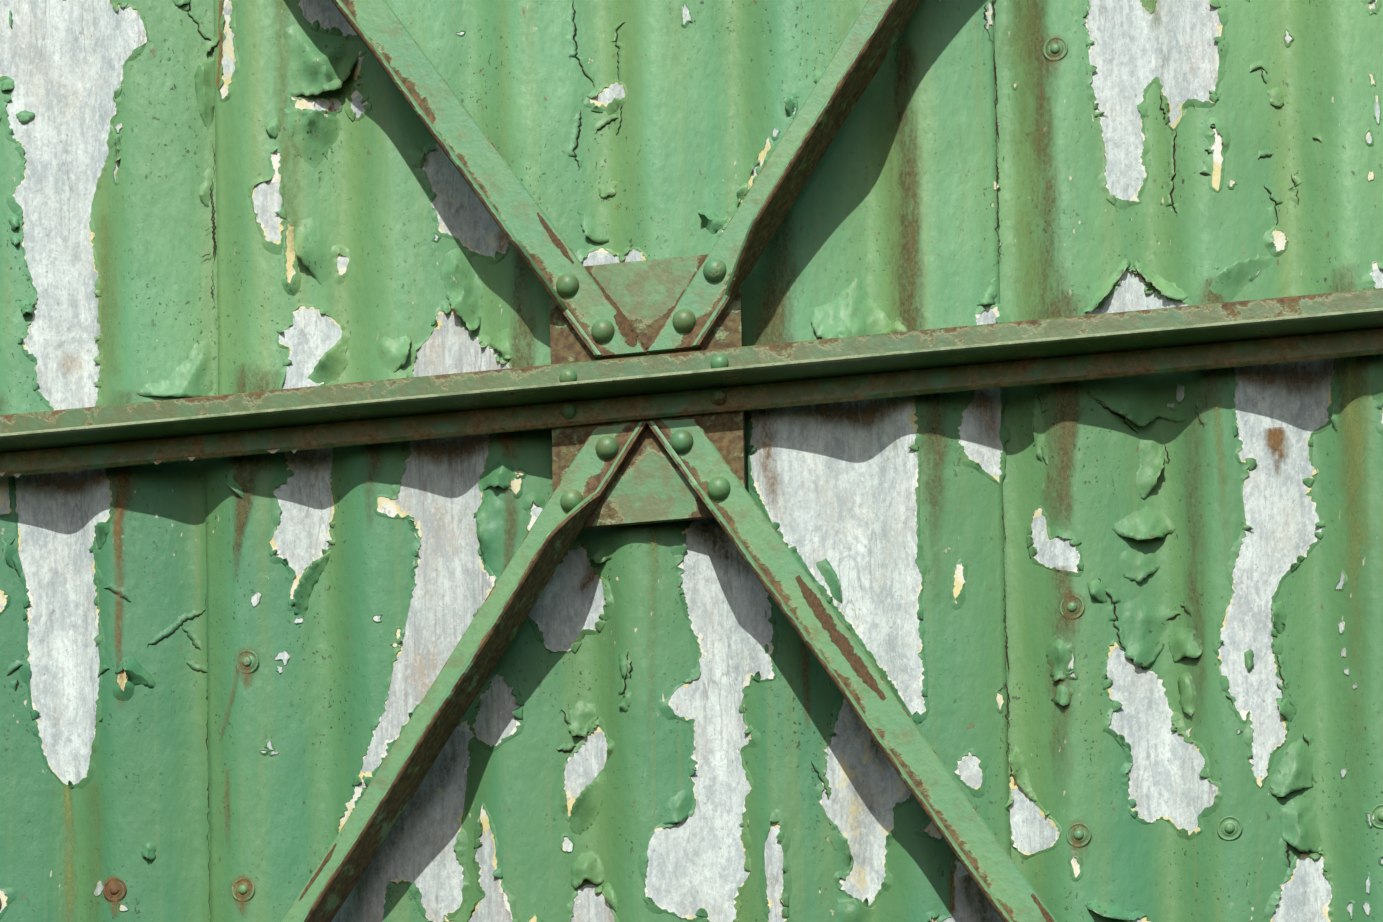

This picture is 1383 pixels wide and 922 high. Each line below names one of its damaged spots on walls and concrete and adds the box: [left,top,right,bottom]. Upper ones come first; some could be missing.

peeling [0,0,149,411]
peeling [0,467,156,789]
peeling [335,433,545,835]
crack [565,0,626,170]
corrosion [614,313,637,347]
peeling [638,518,792,922]
peeling [745,395,930,725]
corrosion [795,575,886,700]
corrosion [1028,0,1058,277]
peeling [1083,0,1238,210]
peeling [1080,358,1383,922]
corrosion [1267,427,1284,466]